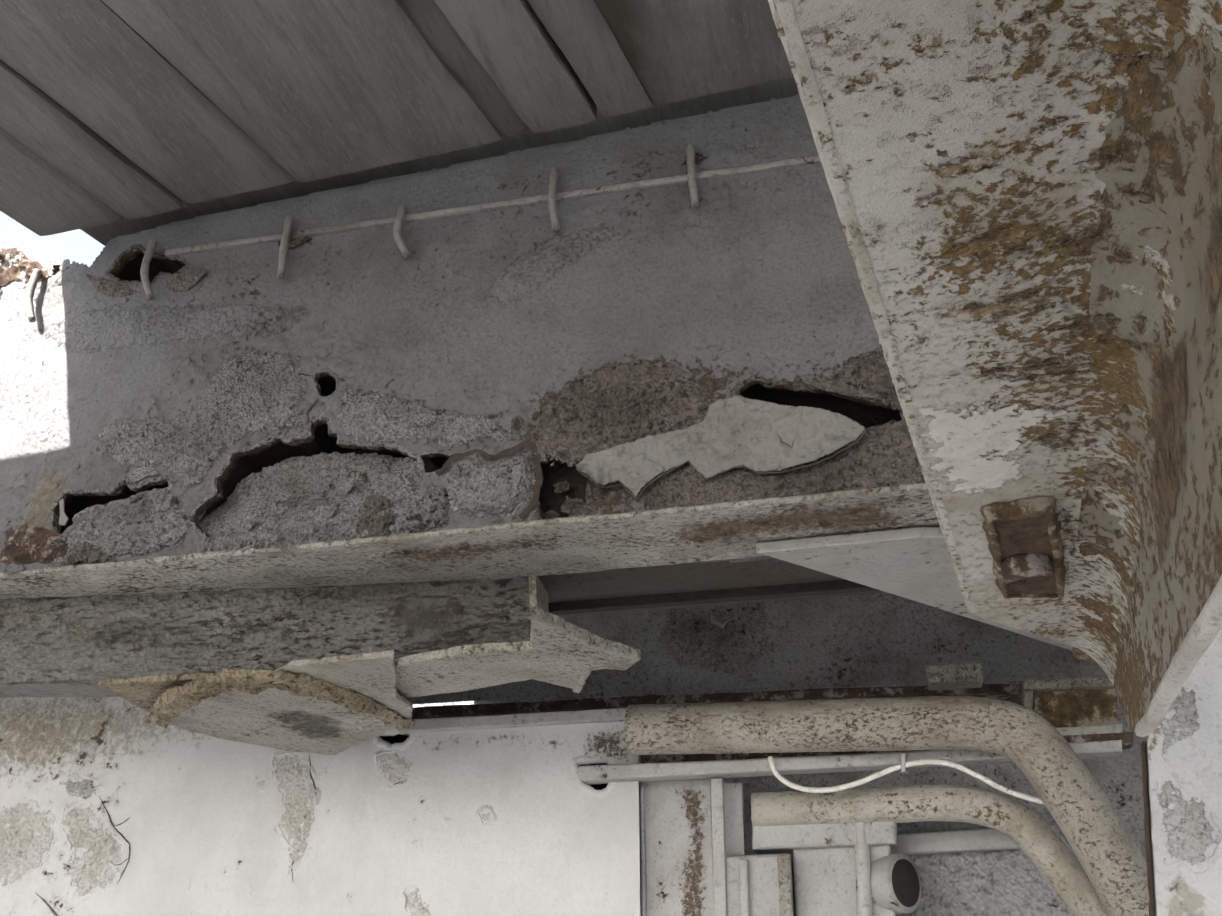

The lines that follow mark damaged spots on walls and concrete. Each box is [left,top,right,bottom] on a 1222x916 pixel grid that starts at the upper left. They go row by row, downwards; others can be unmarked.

corrosion [914,141,1002,206]
spalling [0,248,61,286]
spalling [85,248,186,299]
corrosion [937,291,1054,323]
crack [298,371,318,424]
spalling [314,372,336,397]
corrosion [950,354,1092,383]
peeling [0,380,1067,566]
corrosion [645,345,926,548]
peeling [1150,684,1222,880]
peeling [0,772,124,902]
corrosion [676,790,706,916]